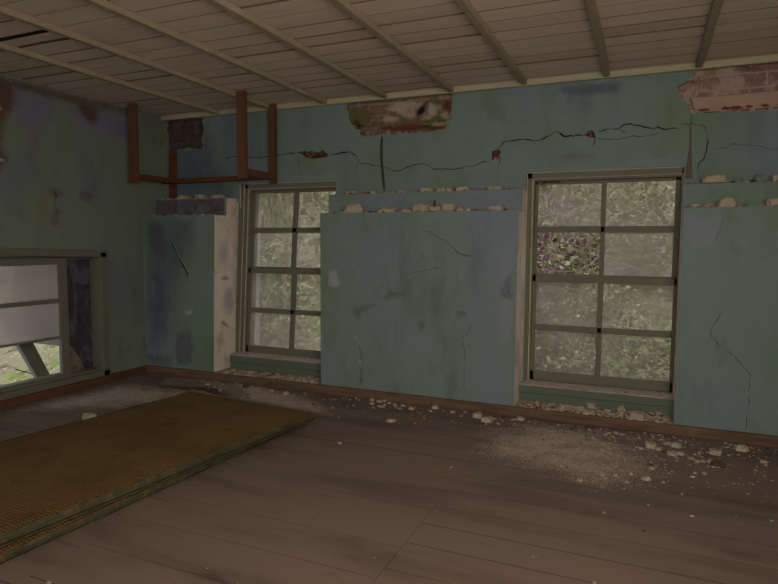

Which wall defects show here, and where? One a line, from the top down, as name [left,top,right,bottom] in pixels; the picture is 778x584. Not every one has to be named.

spalling [678,63,778,114]
leakage [0,76,129,171]
spalling [164,118,204,150]
spalling [347,94,453,137]
crack [334,123,773,192]